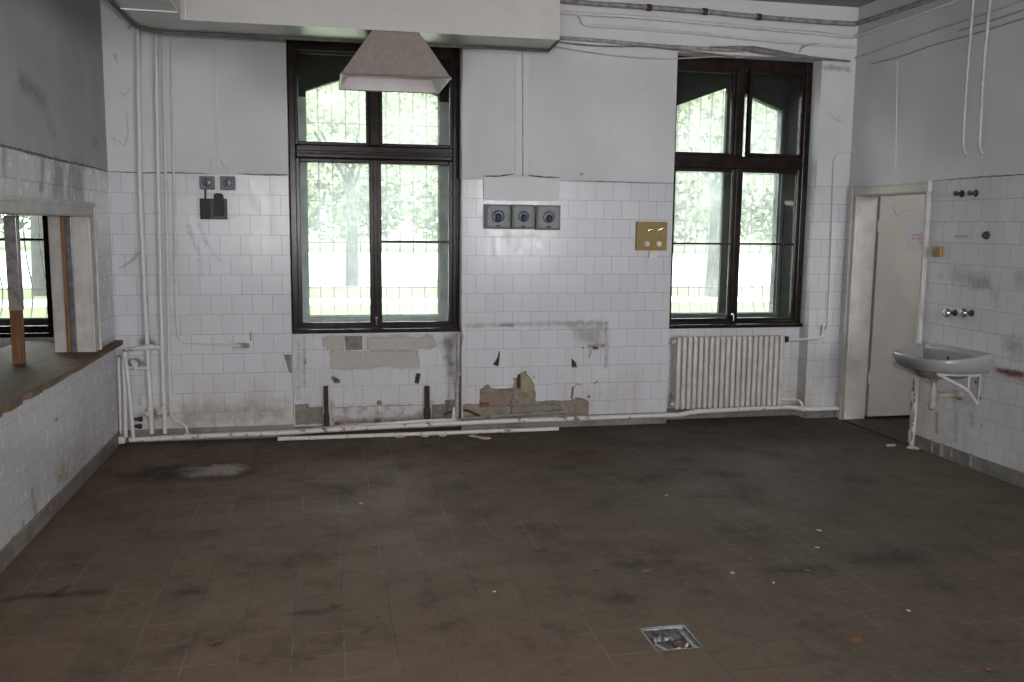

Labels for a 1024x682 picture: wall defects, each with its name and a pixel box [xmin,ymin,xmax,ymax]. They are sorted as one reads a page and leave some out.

peeling [344,336,362,351]
spalling [463,371,589,418]